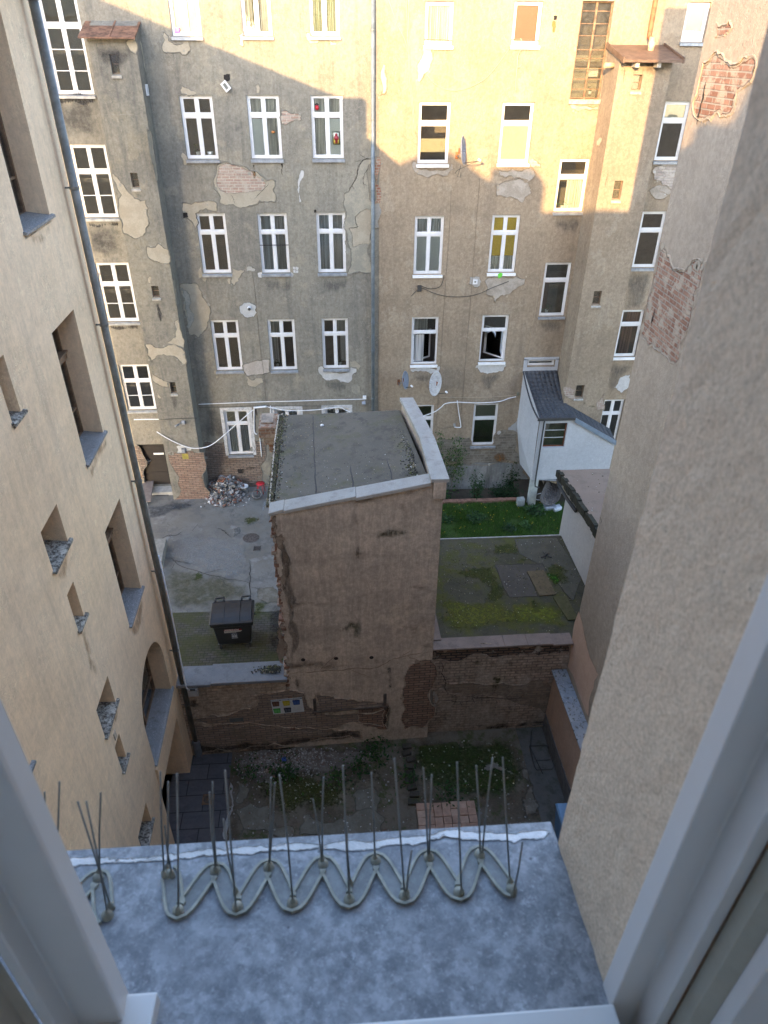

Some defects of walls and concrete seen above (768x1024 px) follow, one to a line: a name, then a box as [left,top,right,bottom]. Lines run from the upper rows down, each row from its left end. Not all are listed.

peeling [161,31,191,56]
flaking render [692,19,758,126]
peeling [111,173,171,265]
peeling [181,160,277,231]
peeling [342,155,383,276]
peeling [495,158,541,204]
flaking render [648,164,677,200]
peeling [145,266,212,398]
peeling [468,275,527,304]
flaking render [640,241,707,366]
spalling [272,516,290,592]
flaking render [185,643,571,755]